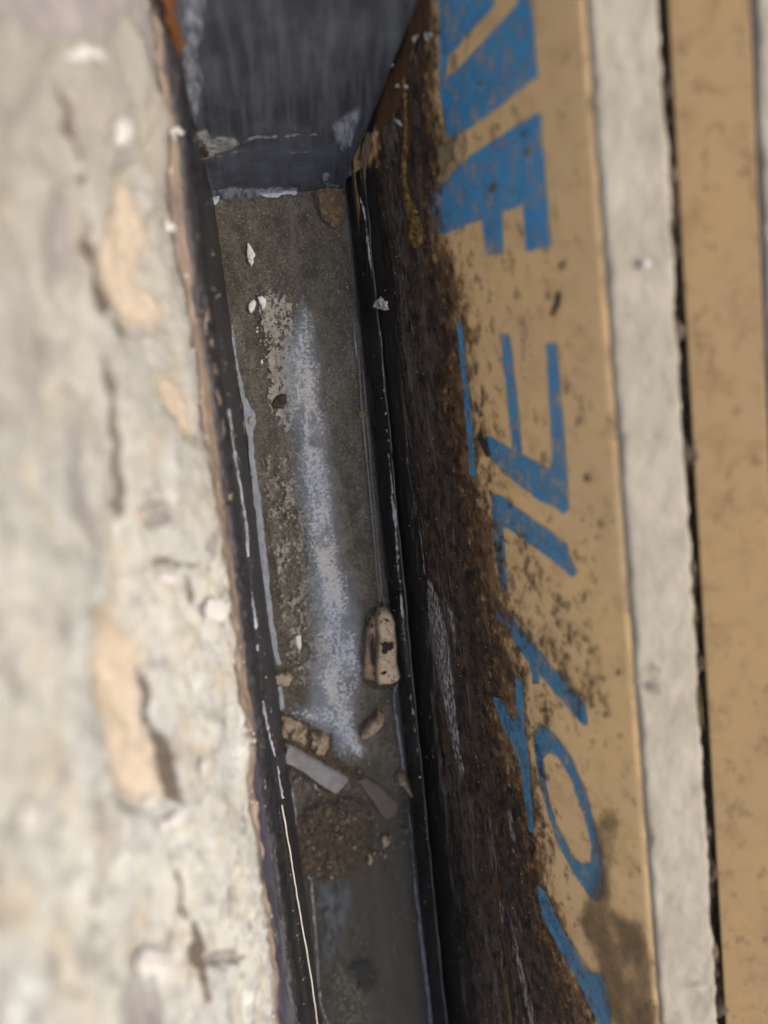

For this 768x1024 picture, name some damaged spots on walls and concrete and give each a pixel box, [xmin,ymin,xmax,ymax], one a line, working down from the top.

rust [375,0,431,249]
rust [388,454,405,641]
water stain [197,15,655,1024]